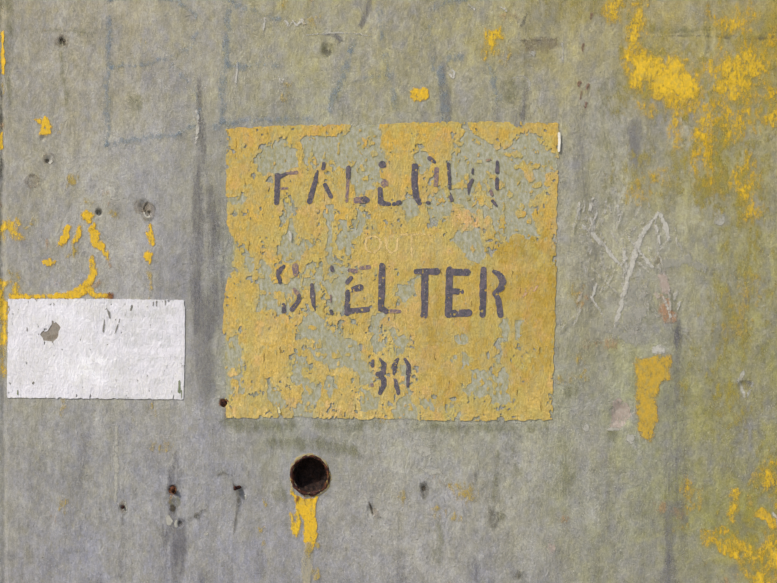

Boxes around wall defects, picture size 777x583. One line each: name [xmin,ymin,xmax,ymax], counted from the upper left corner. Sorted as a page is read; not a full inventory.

peeling [620,3,777,157]
peeling [0,217,23,240]
peeling [255,124,390,197]
peeling [399,121,559,263]
peeling [0,272,20,377]
peeling [40,321,60,344]
peeling [243,202,380,418]
peeling [368,312,435,419]
peeling [395,274,421,303]
peeling [450,333,515,407]
peeling [497,318,524,344]
peeling [700,507,777,583]